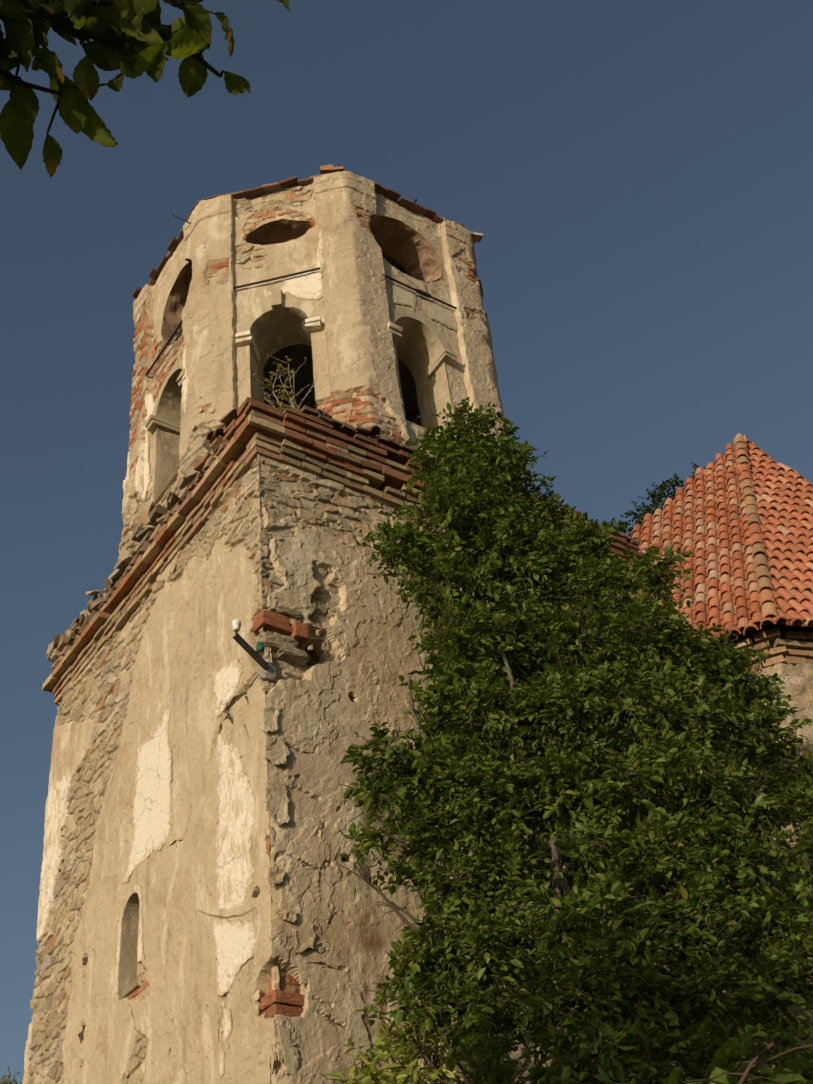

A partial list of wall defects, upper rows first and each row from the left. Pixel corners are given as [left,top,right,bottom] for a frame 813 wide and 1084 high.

flaking render [199,186,326,300]
spalling [119,302,225,560]
spalling [316,389,405,443]
spalling [27,460,449,1084]
crack [307,948,335,969]